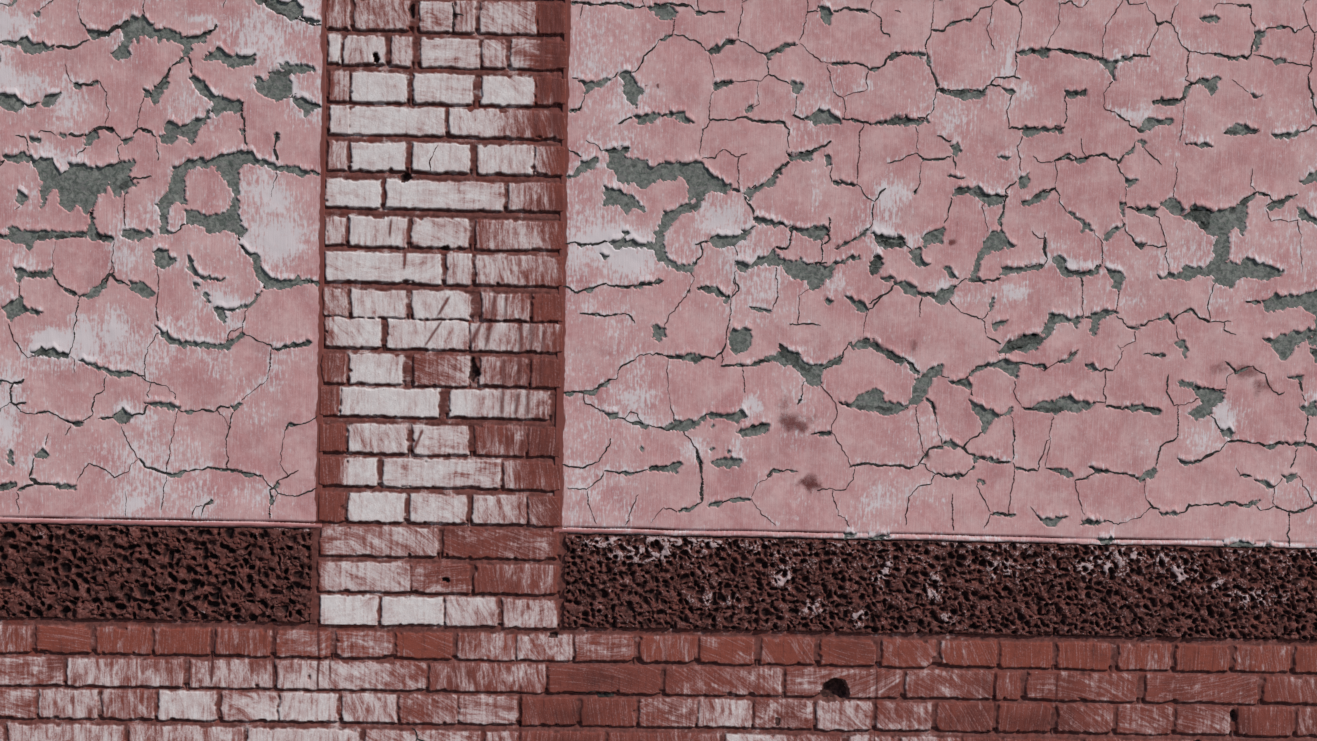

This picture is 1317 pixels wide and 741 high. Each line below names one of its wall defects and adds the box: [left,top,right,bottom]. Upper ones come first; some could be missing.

crack [65,64,159,163]
crack [571,0,1317,230]
peeling [0,0,321,400]
crack [563,273,771,326]
peeling [563,42,1317,524]
crack [0,242,317,518]
crack [564,359,636,397]
crack [1040,345,1124,372]
peeling [29,433,49,477]
crack [811,399,1317,550]
peeling [1030,506,1153,545]
peeling [1223,535,1274,548]